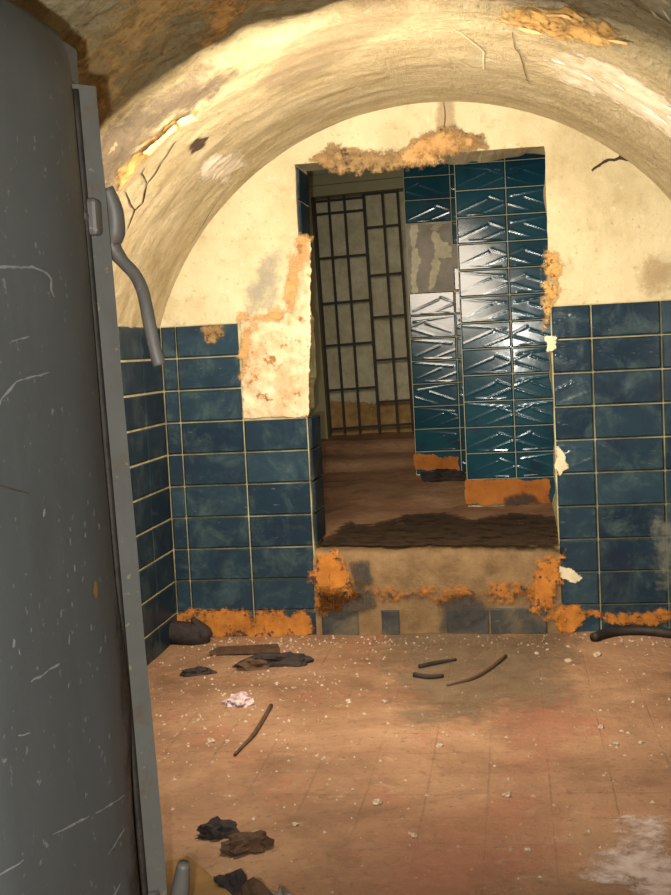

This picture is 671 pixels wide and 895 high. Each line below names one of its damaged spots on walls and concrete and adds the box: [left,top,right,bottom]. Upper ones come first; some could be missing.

spalling [500,2,627,48]
crack [512,32,529,83]
spalling [309,125,489,176]
crack [591,155,627,171]
spalling [541,250,563,352]
spalling [236,235,312,419]